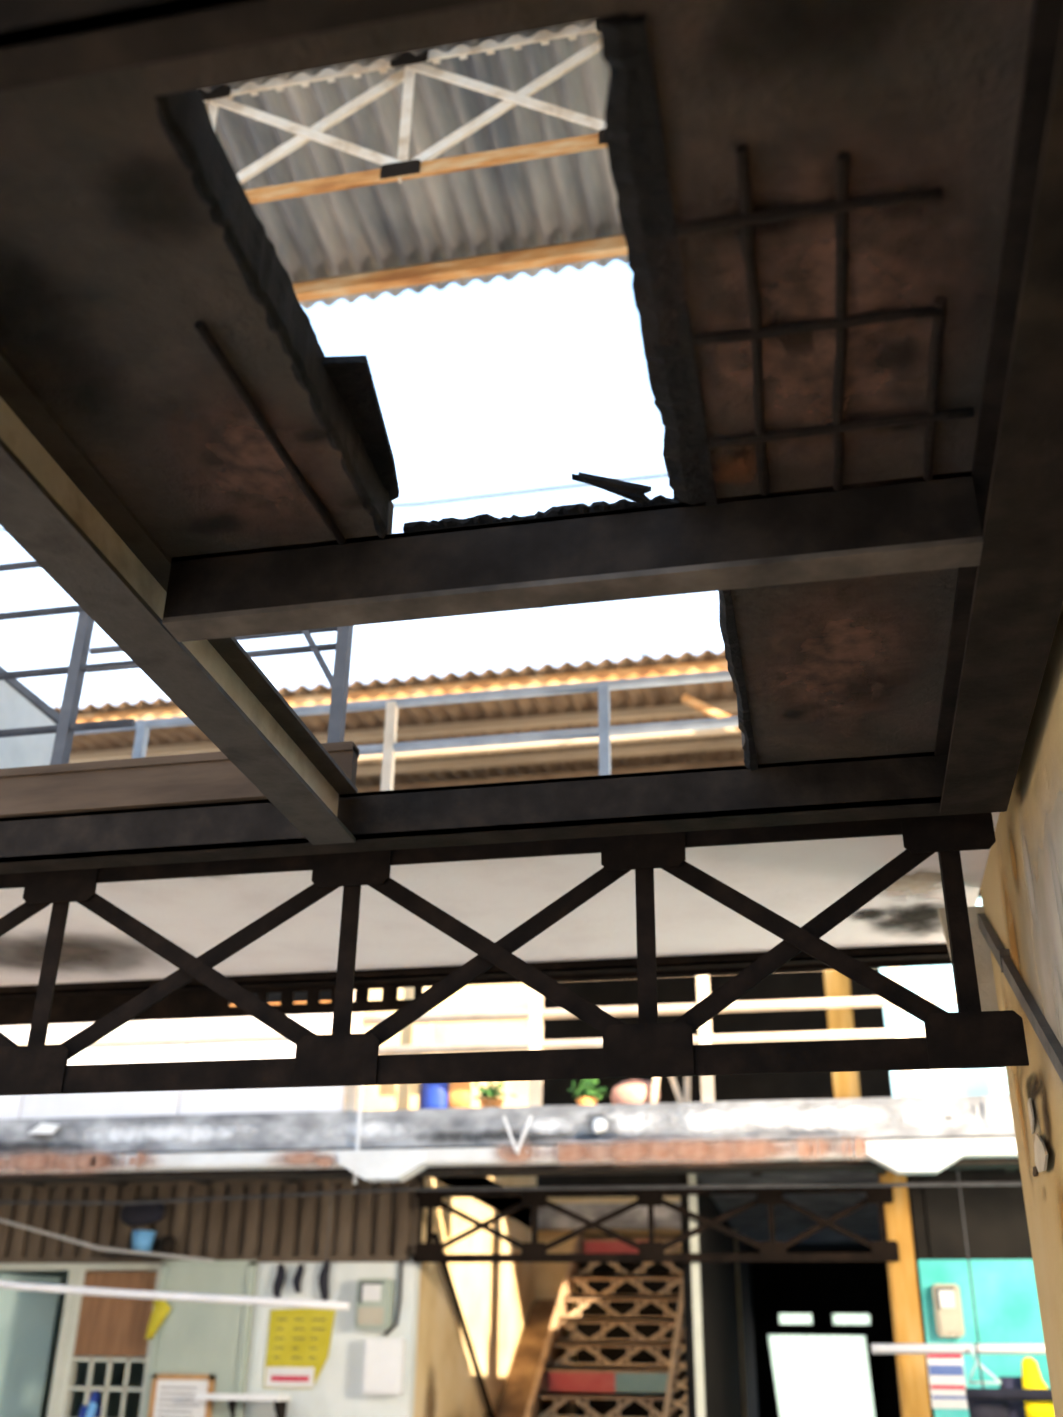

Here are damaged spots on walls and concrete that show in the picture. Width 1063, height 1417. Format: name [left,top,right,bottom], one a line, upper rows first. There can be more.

water stain [855,904,941,933]
water stain [93,1125,234,1143]
water stain [330,1121,404,1138]
water stain [433,1118,571,1141]
water stain [606,1105,955,1134]
water stain [976,1103,1014,1126]
rust [0,1152,149,1172]
rust [281,1152,334,1167]